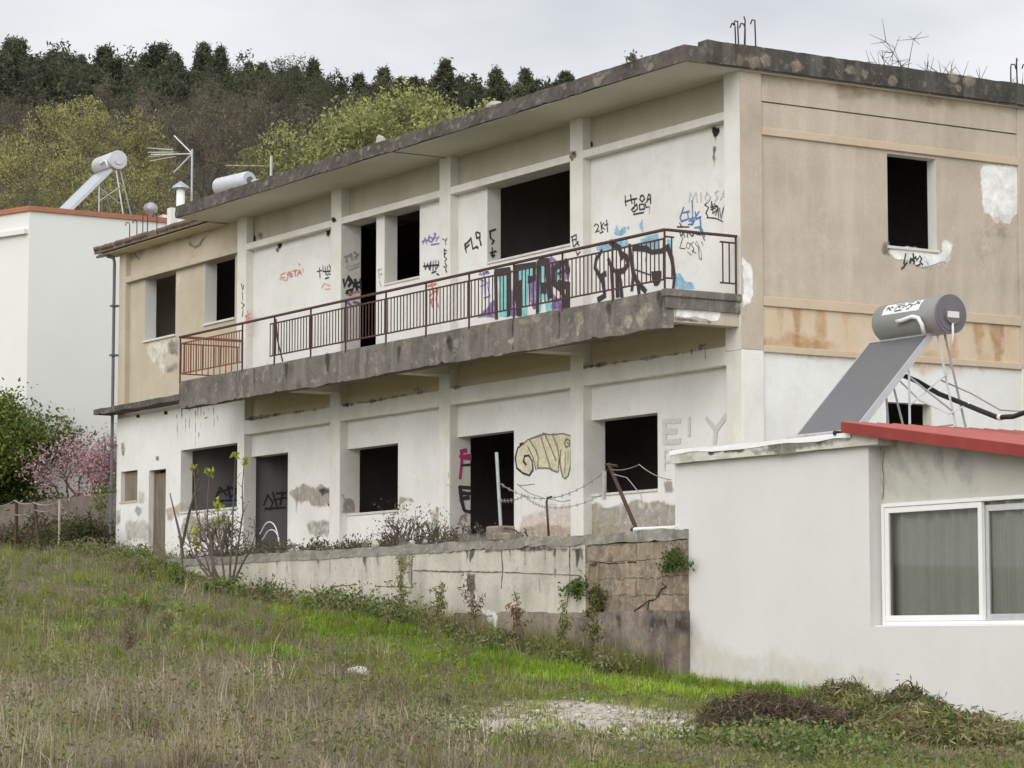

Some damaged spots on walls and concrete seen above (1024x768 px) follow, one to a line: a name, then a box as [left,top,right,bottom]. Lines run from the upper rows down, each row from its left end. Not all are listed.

peeling [980,164,1018,237]
peeling [883,239,952,268]
peeling [742,257,754,307]
peeling [147,337,179,373]
peeling [290,484,329,506]
peeling [592,481,675,534]